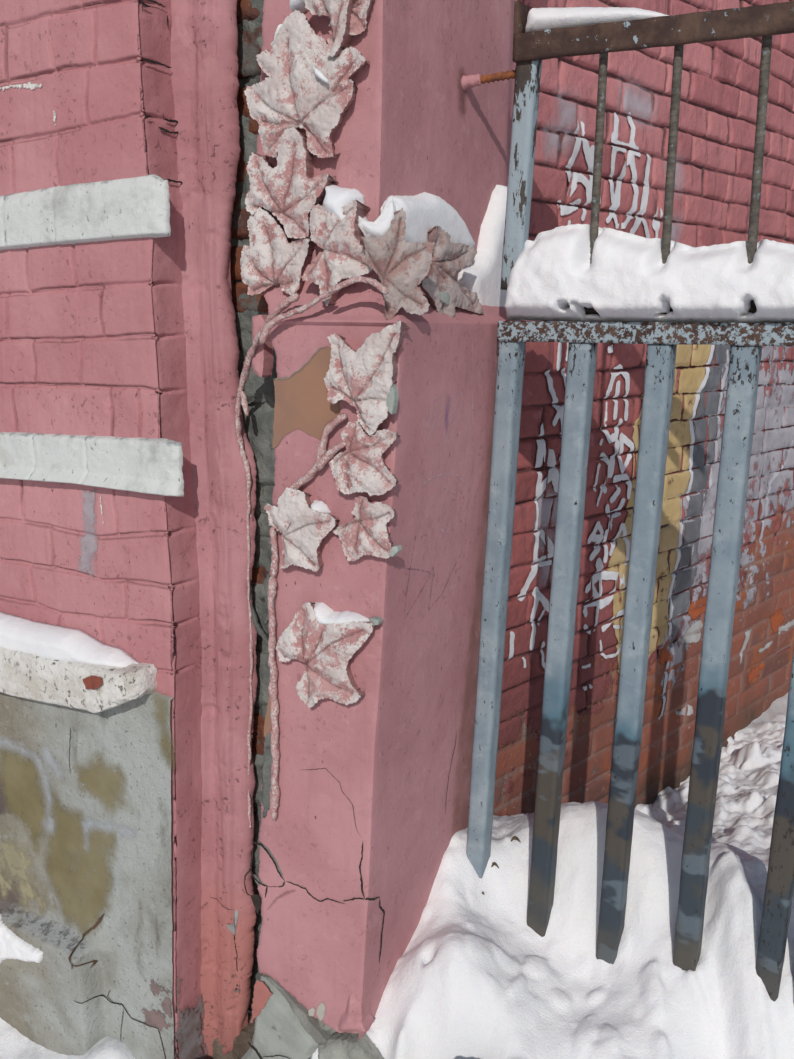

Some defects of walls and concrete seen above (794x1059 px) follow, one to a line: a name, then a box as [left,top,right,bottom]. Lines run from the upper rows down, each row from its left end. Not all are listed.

peeling [273,346,340,448]
crack [214,0,385,1011]
peeling [722,495,794,747]
peeling [493,704,540,816]
peeling [561,657,619,804]
peeling [635,588,707,807]
crack [68,914,104,969]
crack [75,991,166,1059]
peeling [141,978,208,1059]
spalling [250,973,335,1045]